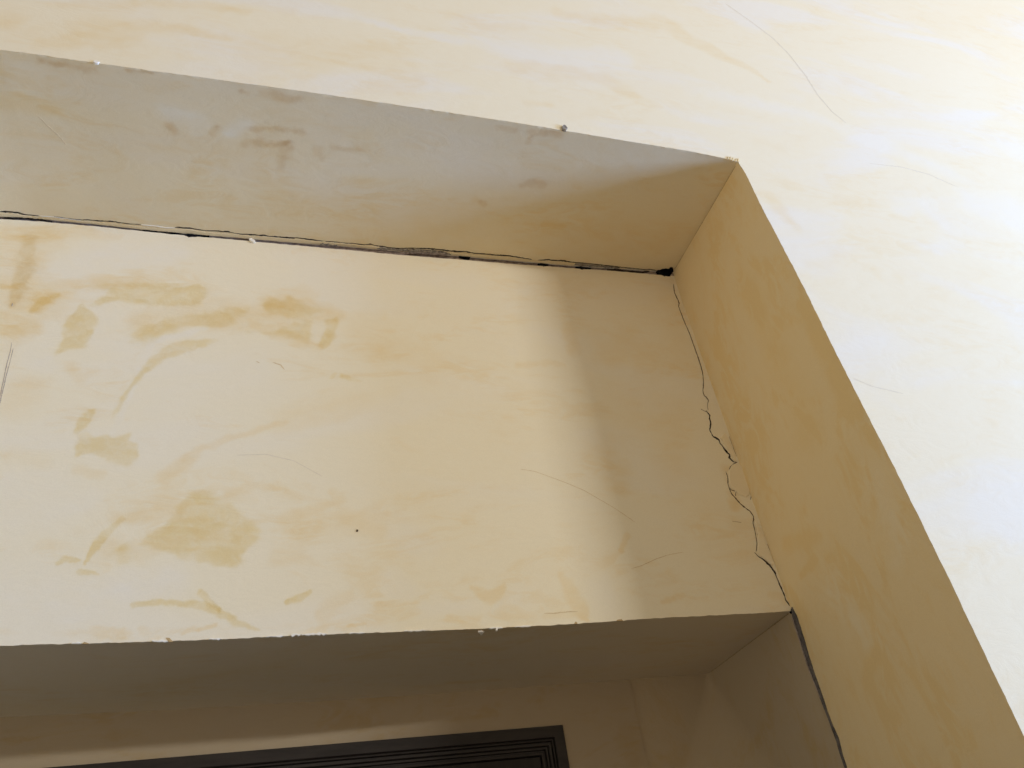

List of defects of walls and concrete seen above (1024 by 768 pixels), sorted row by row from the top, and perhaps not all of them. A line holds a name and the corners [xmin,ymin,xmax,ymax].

crack [0,167,790,672]